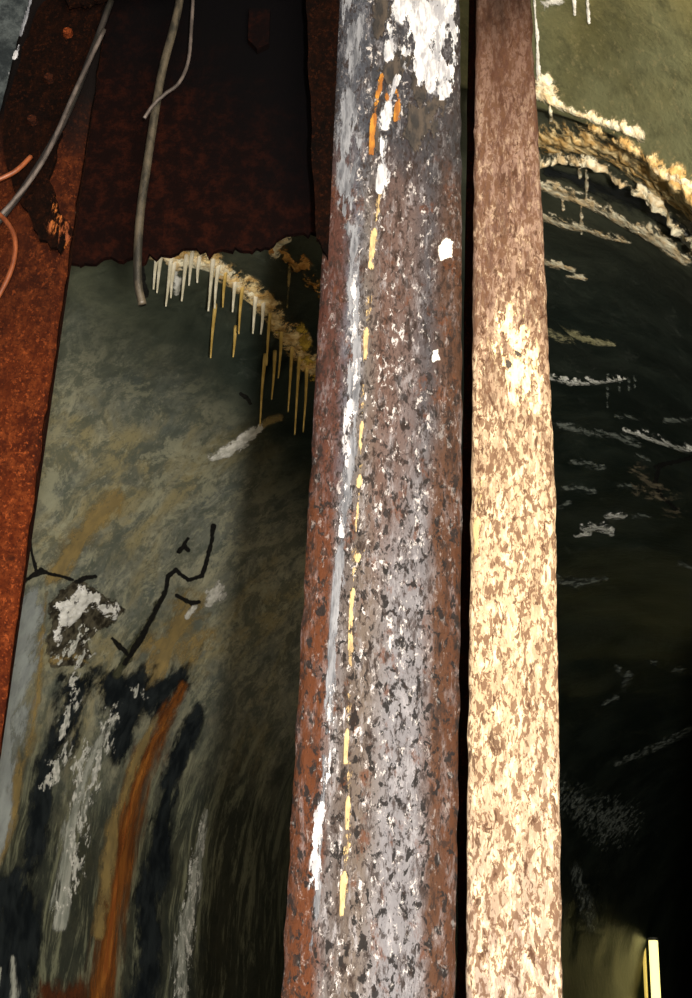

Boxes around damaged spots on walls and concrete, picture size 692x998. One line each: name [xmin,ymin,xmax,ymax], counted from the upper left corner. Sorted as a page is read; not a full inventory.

rust [48,204,71,249]
rust [369,73,401,155]
damp [536,85,692,266]
damp [149,251,317,462]
peeling [324,0,460,733]
damp [550,373,692,518]
crack [26,542,97,584]
spalling [45,582,126,670]
crack [111,524,216,678]
damp [0,490,227,998]
rust [38,682,187,998]
peeling [308,729,352,960]